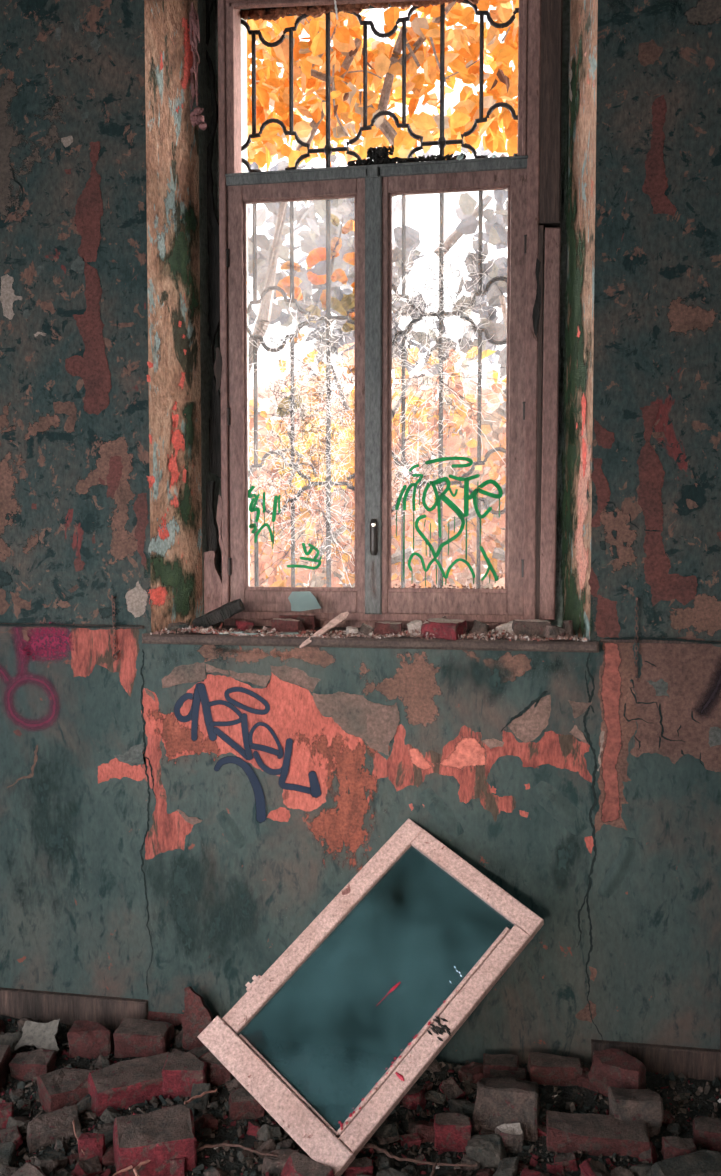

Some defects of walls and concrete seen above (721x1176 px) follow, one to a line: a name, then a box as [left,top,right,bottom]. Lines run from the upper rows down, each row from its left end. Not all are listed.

peeling [181,17,194,90]
peeling [568,52,587,101]
crack [0,623,157,992]
peeling [1,393,721,871]
crack [577,637,721,1040]